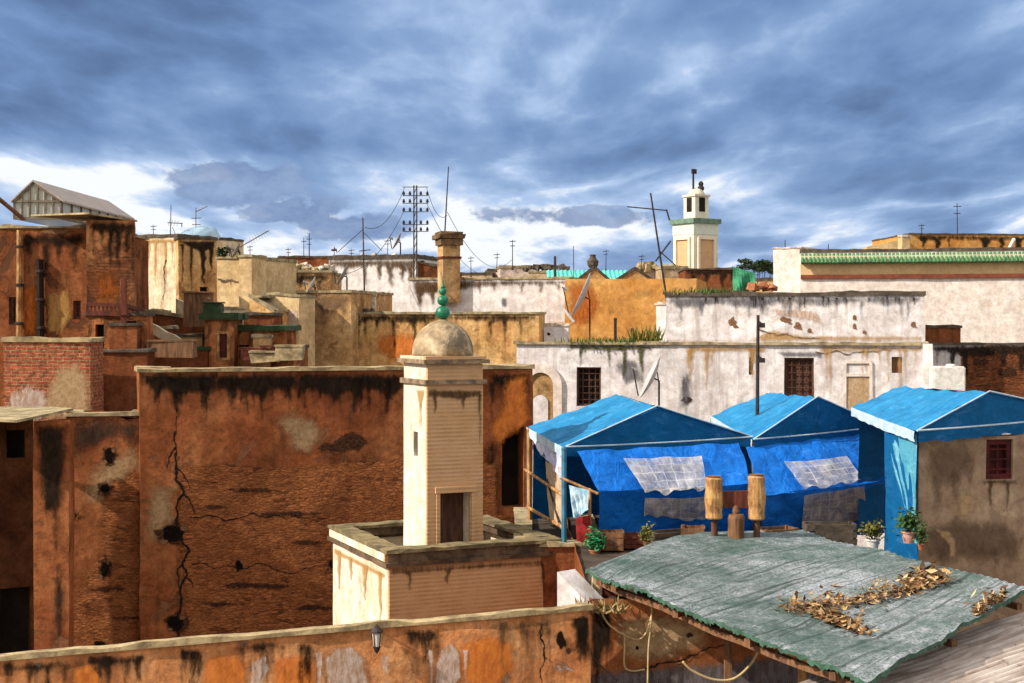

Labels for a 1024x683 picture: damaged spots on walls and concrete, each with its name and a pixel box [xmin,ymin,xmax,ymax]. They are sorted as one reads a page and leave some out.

water stain [23,222,133,270]
water stain [147,240,214,283]
water stain [296,260,529,346]
water stain [460,280,564,290]
peeling [773,309,822,333]
water stain [142,373,402,412]
water stain [682,331,919,409]
water stain [37,420,134,526]
spalling [74,432,404,647]
crack [166,403,330,637]
spalling [483,463,515,524]
crack [539,625,551,680]